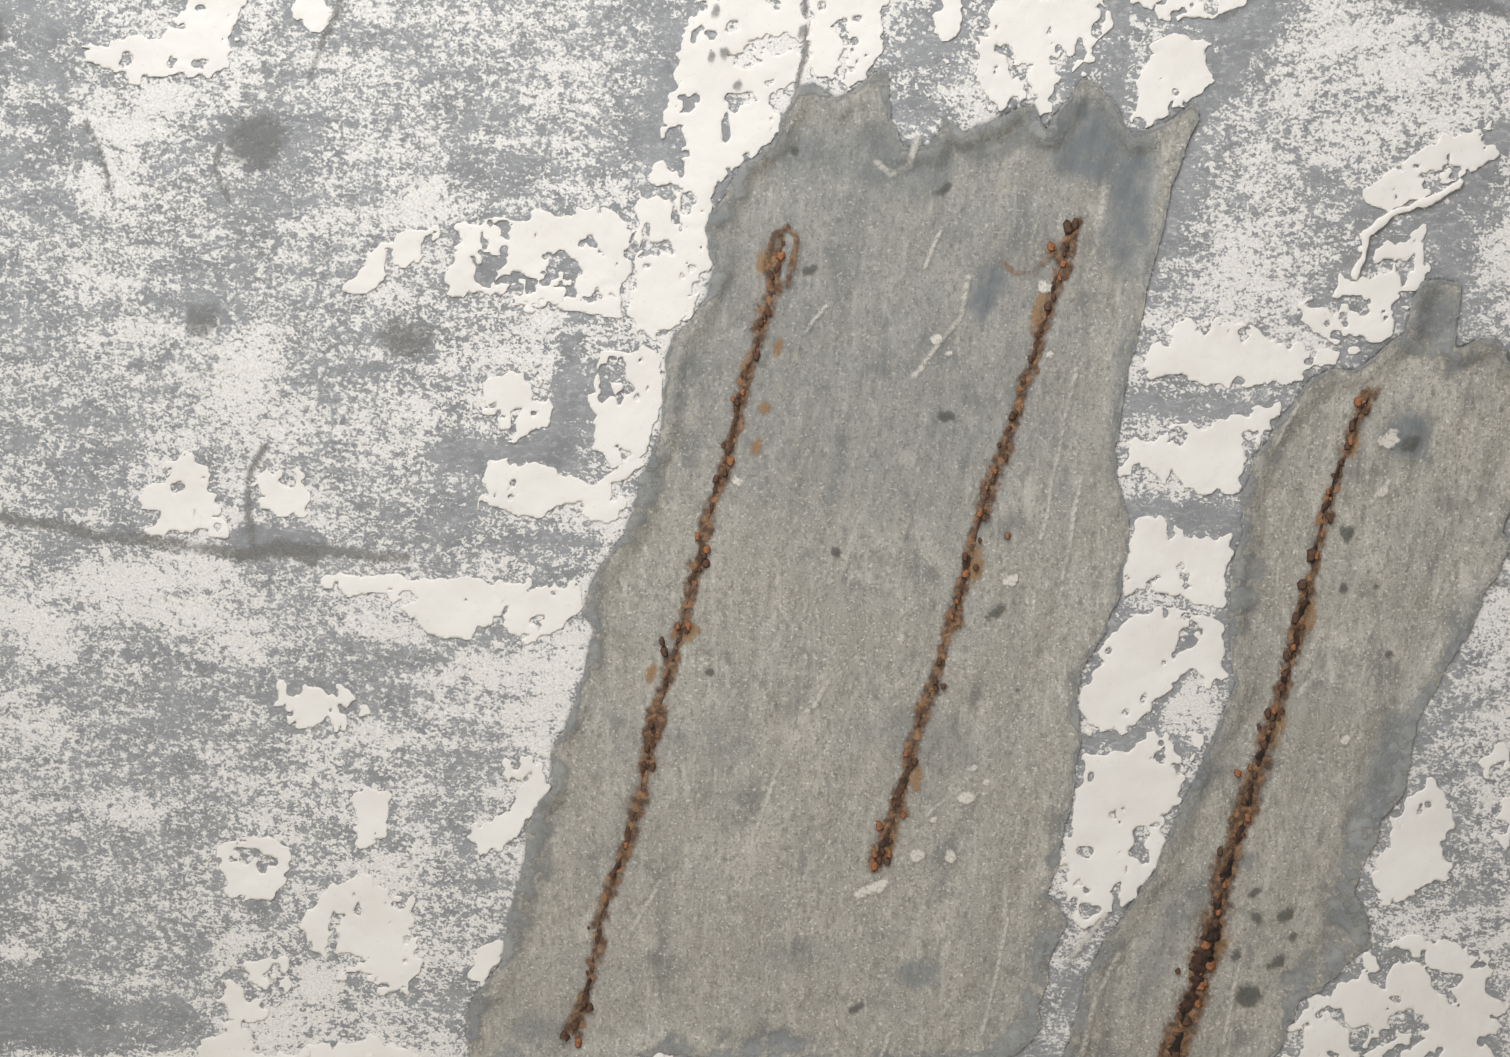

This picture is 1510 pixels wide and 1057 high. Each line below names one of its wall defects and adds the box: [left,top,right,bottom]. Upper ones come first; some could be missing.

peeling [81,0,248,86]
peeling [291,0,335,33]
peeling [138,451,230,540]
crack [0,444,409,565]
spalling [321,0,1510,1057]
corrosion [867,216,1082,872]
corrosion [560,224,799,1048]
peeling [274,680,371,732]
corrosion [1158,387,1380,1057]
peeling [216,835,292,901]
peeling [300,874,423,996]
peeling [196,956,420,1057]